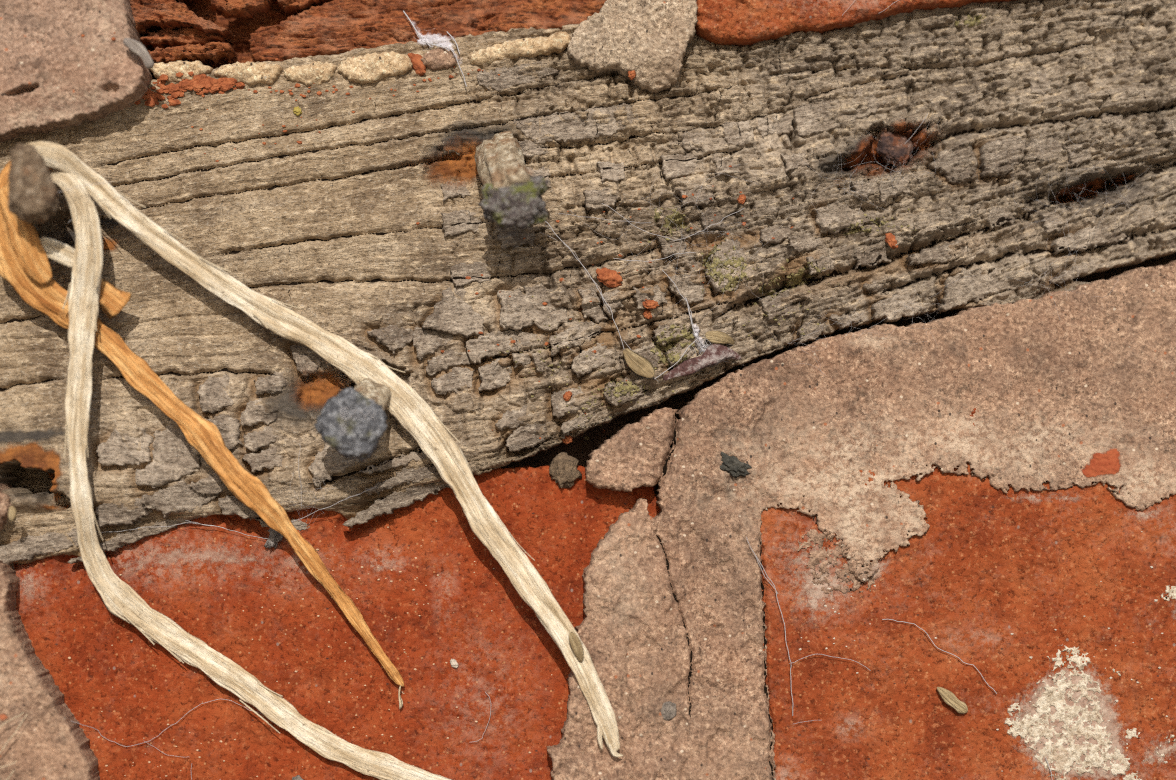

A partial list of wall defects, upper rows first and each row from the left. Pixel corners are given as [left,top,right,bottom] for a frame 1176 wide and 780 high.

crack [655,411,679,496]
peeling [1082,449,1121,477]
peeling [1161,585,1176,601]
crack [651,527,693,719]
peeling [1047,644,1091,671]
peeling [1007,702,1024,738]
damp [1015,670,1125,779]
peeling [1125,728,1140,739]
damp [1144,743,1176,763]